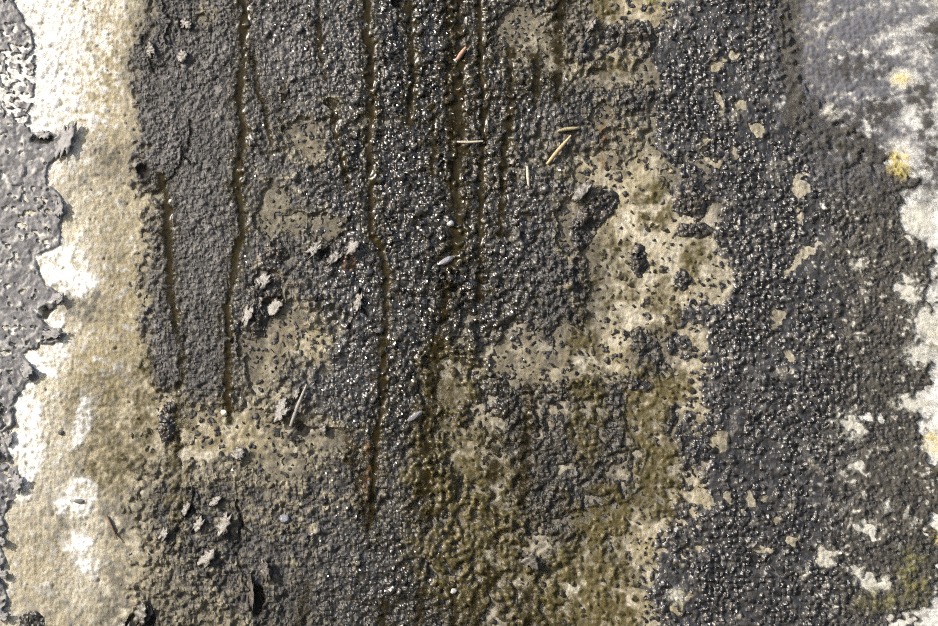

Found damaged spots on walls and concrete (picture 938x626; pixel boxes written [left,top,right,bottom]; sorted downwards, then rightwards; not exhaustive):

peeling [0,0,77,621]
spalling [137,164,150,178]
peeling [145,39,156,59]
leakage [156,173,180,338]
leakage [222,0,286,425]
leakage [355,0,398,528]
leakage [421,0,493,303]
leakage [496,47,517,237]
leakage [529,0,566,104]
peeling [571,177,592,204]
leakage [769,0,938,623]
peeling [117,599,155,626]